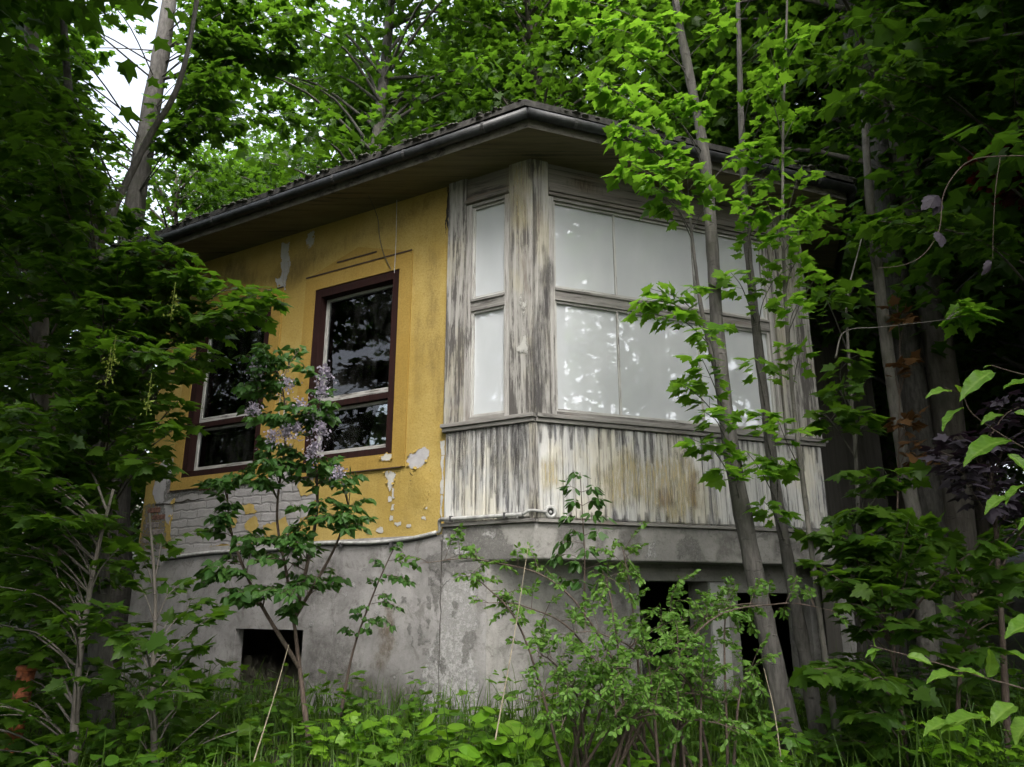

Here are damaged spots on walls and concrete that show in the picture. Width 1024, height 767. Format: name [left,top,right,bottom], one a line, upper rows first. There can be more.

peeling [275,242,291,290]
peeling [406,447,430,470]
damp [599,429,693,460]
spalling [139,458,316,554]
peeling [376,452,426,533]